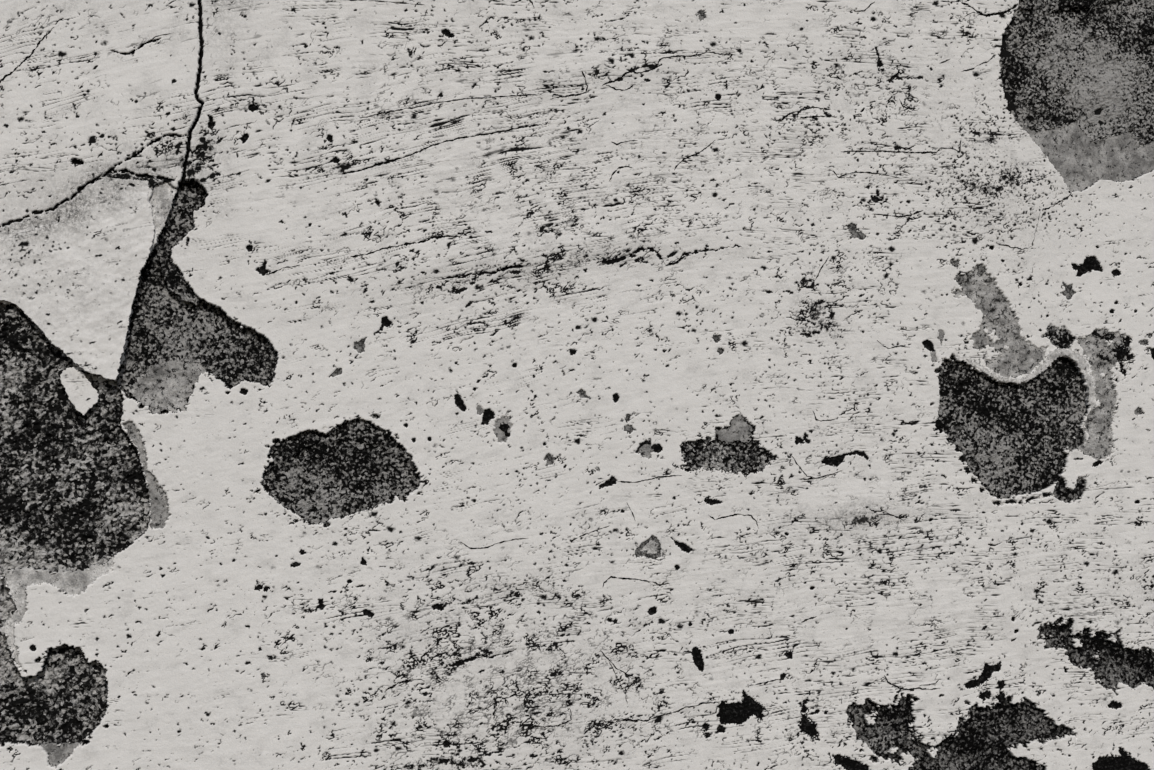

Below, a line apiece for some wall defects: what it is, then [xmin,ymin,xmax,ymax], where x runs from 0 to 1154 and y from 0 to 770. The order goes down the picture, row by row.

crack [0,0,203,227]
flaking render [999,0,1154,192]
spalling [1061,246,1121,300]
flaking render [922,259,1154,505]
flaking render [0,177,277,768]
flaking render [255,414,431,526]
spalling [680,414,777,475]
spalling [703,691,764,738]
flaking render [832,661,1075,770]
flaking render [1037,618,1154,709]